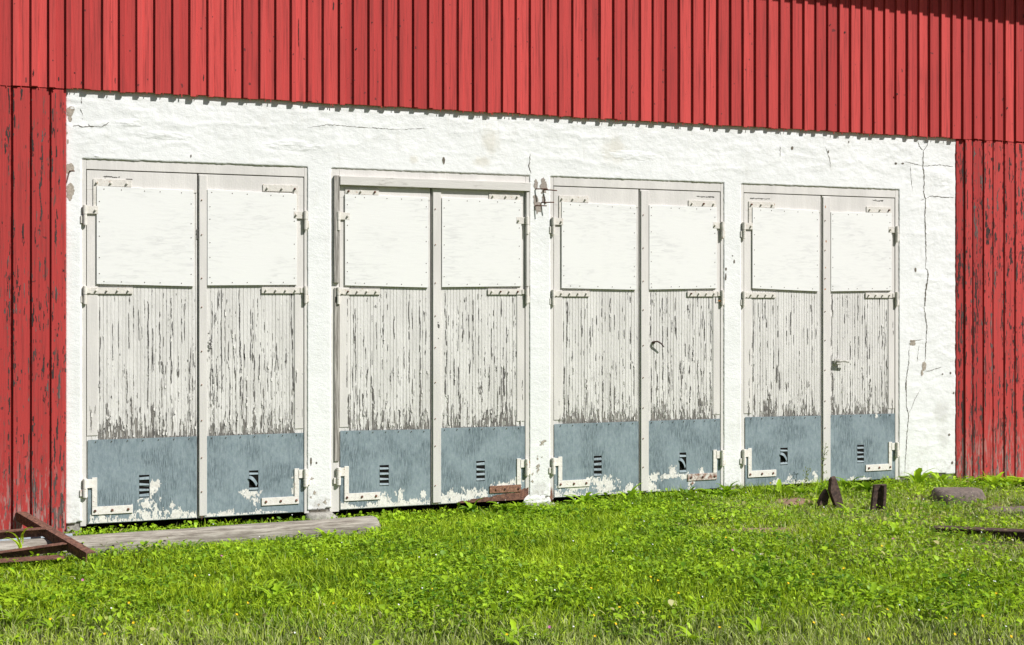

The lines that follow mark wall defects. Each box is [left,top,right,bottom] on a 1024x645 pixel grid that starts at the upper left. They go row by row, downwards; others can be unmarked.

peeling [2,88,75,529]
peeling [90,293,196,440]
peeling [207,291,303,436]
peeling [346,293,523,431]
peeling [559,293,717,424]
peeling [748,294,894,418]
crack [902,143,954,480]
peeling [942,141,1024,478]
peeling [89,479,286,523]
corrosion [459,487,529,503]
peeling [555,465,704,497]